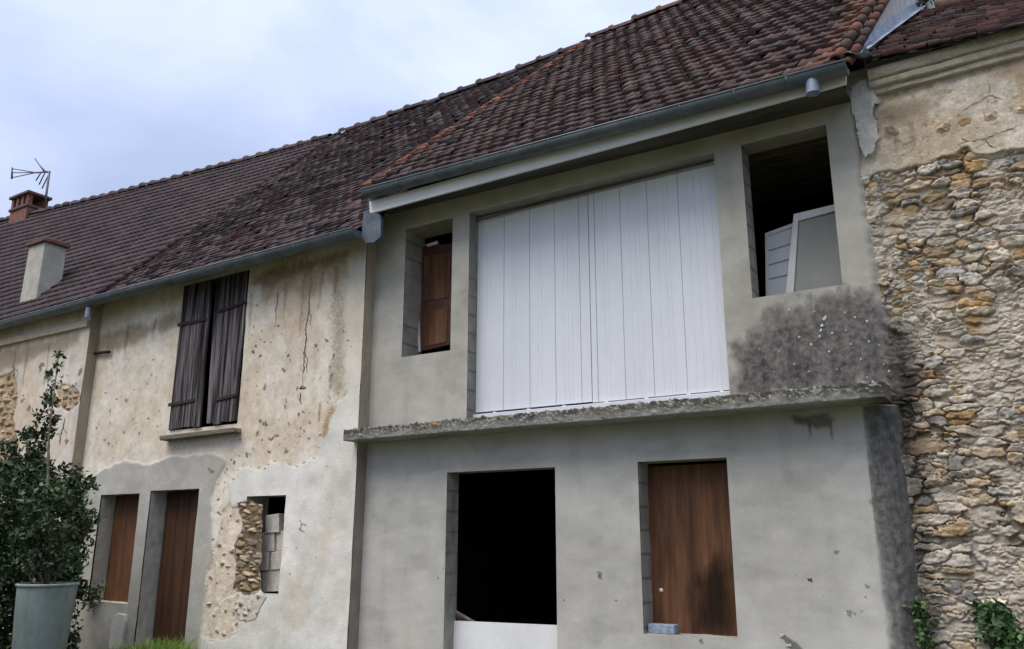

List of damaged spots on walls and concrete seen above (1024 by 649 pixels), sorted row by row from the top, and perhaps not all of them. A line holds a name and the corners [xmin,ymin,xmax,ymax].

crack [957,124,1022,147]
flaking render [0,371,31,472]
flaking render [39,362,82,411]
crack [299,267,312,404]
leakage [794,414,832,435]
leakage [732,294,901,393]
flaking render [203,392,339,642]
leakage [864,405,926,649]